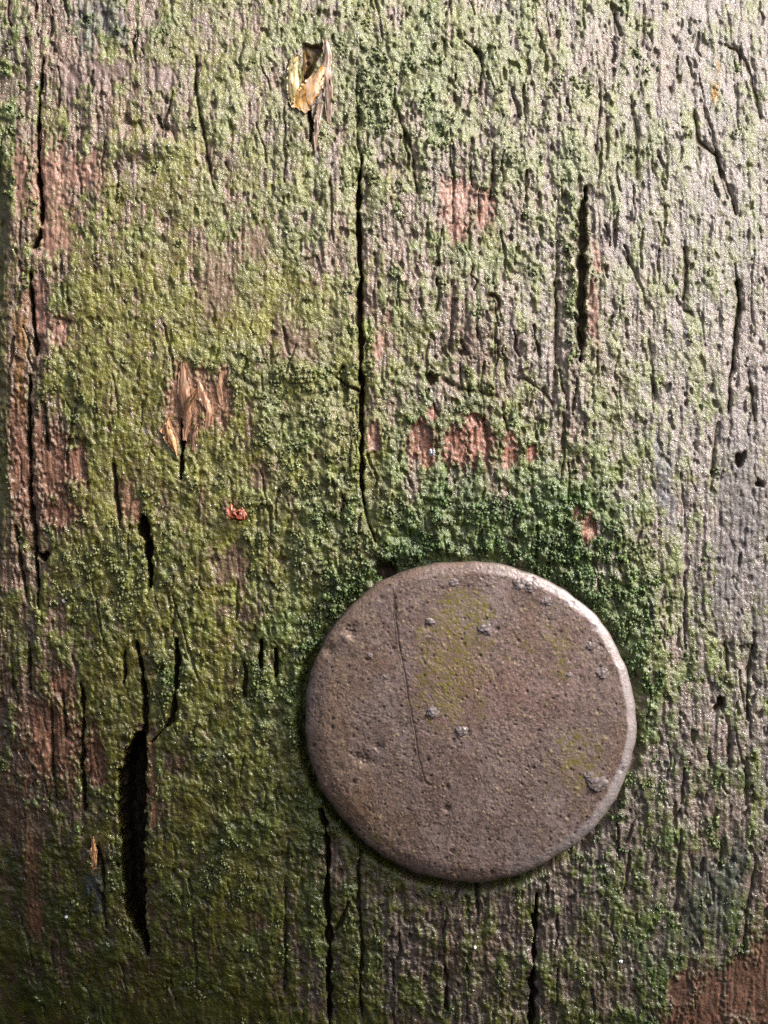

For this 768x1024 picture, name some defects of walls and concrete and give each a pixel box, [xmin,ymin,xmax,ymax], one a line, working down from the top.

peeling [287,54,330,114]
crack [29,64,45,355]
crack [15,384,50,597]
crack [113,464,154,586]
peeling [160,361,234,457]
crack [335,110,376,542]
crack [444,380,496,396]
crack [516,189,588,475]
crack [100,638,181,944]
crack [320,808,365,1024]
crack [527,893,537,1024]